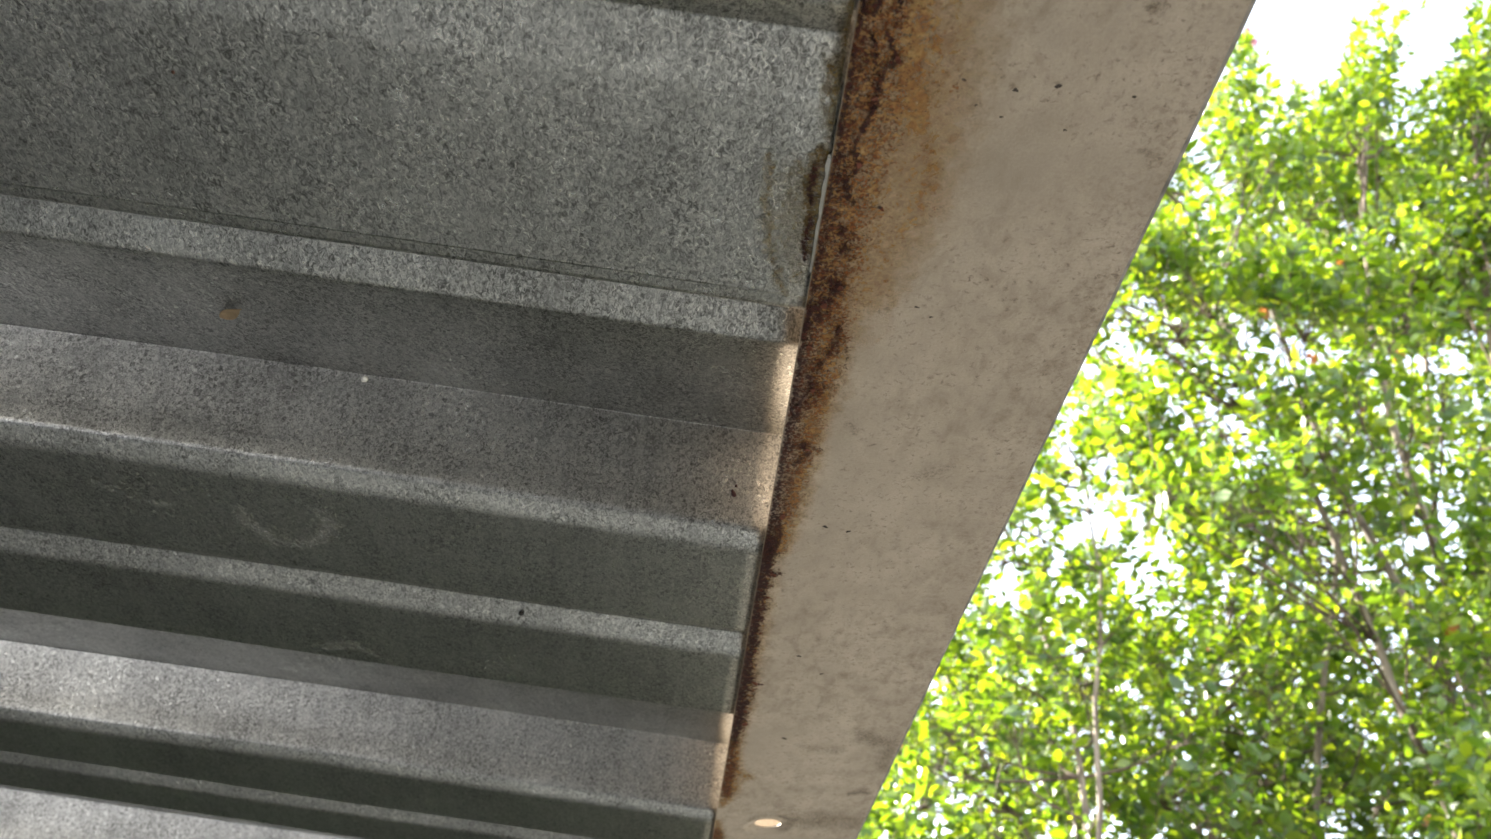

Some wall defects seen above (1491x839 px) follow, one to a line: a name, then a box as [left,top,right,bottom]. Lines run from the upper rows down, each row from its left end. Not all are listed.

corrosion [713,0,973,839]